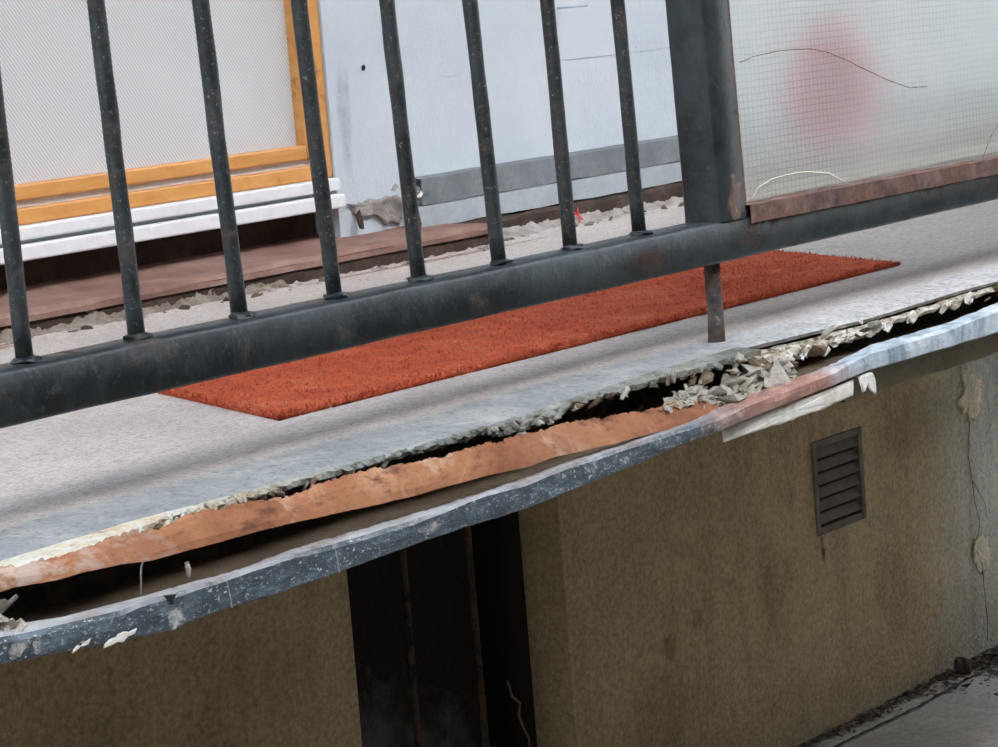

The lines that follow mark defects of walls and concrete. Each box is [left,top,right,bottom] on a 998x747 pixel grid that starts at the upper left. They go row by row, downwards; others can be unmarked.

peeling [939,286,998,314]
spalling [452,319,893,448]
spalling [303,454,402,491]
spalling [204,488,288,511]
spalling [140,508,191,533]
crack [968,422,988,640]
peeling [168,608,183,629]